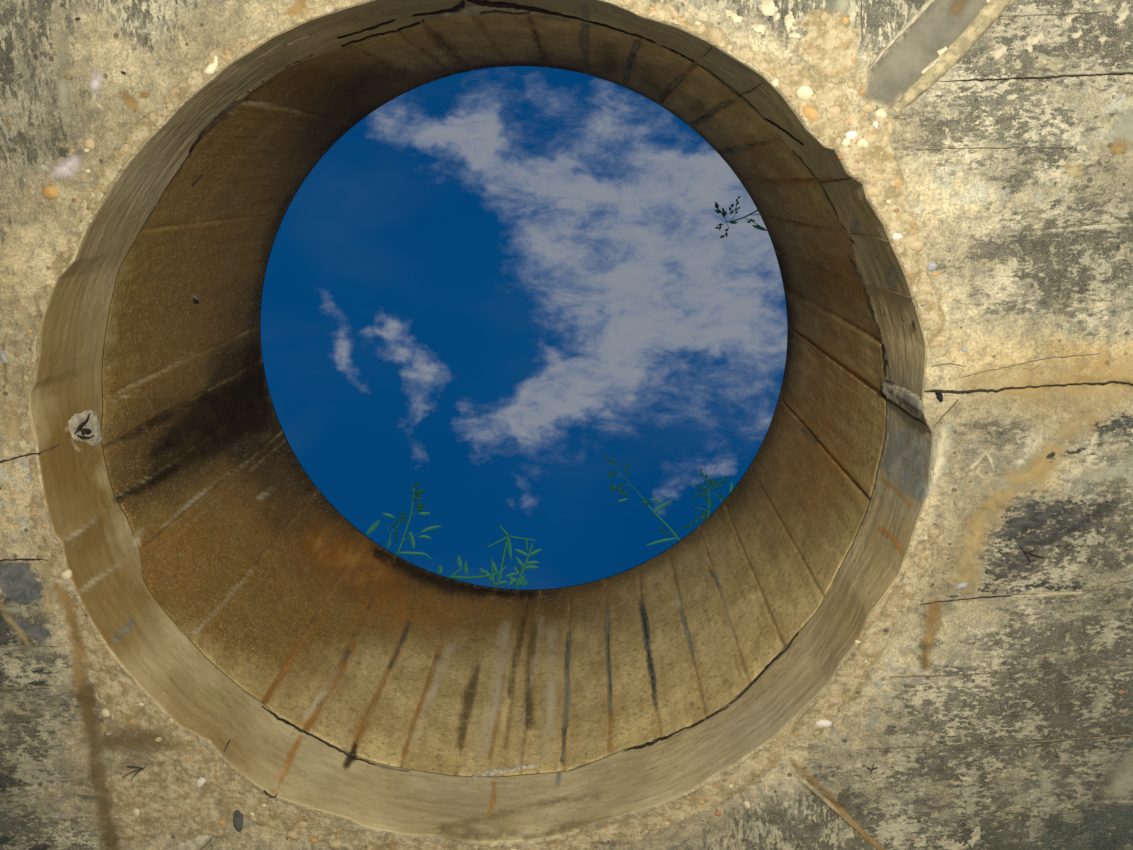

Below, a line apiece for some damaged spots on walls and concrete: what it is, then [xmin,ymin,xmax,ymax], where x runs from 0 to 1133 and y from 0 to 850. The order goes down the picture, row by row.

crack [180,0,1133,427]
crack [0,444,59,463]
water stain [116,346,267,501]
rust [272,642,356,792]
rust [344,717,365,767]
water stain [459,676,475,739]
water stain [524,674,533,726]